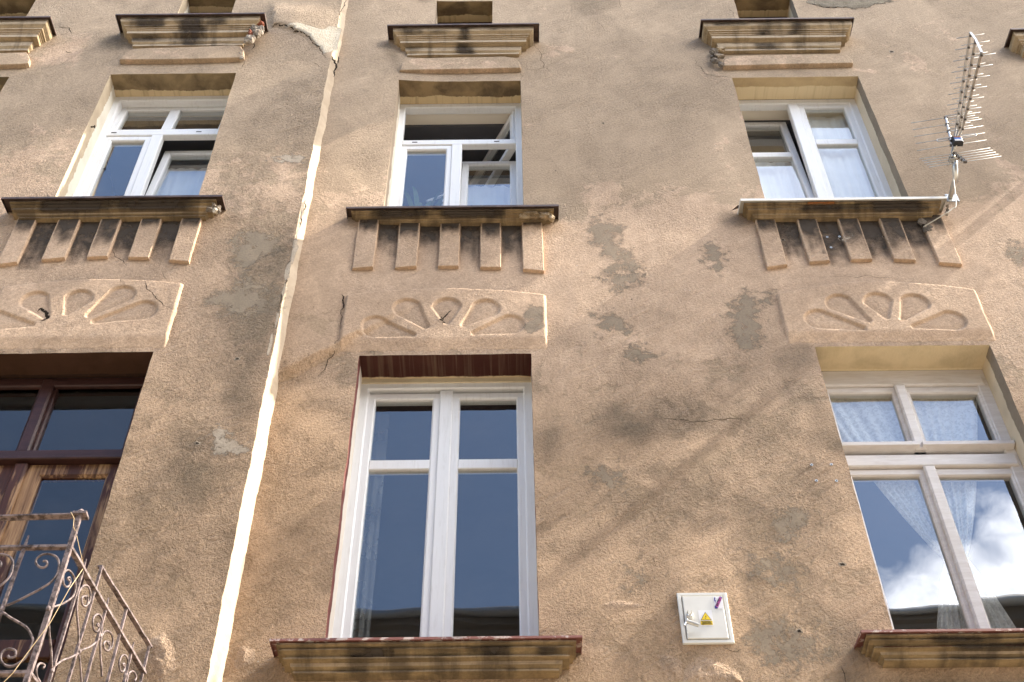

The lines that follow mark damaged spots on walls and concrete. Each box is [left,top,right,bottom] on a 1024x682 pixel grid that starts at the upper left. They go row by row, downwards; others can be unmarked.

crack [240,23,339,76]
flaking render [285,22,341,53]